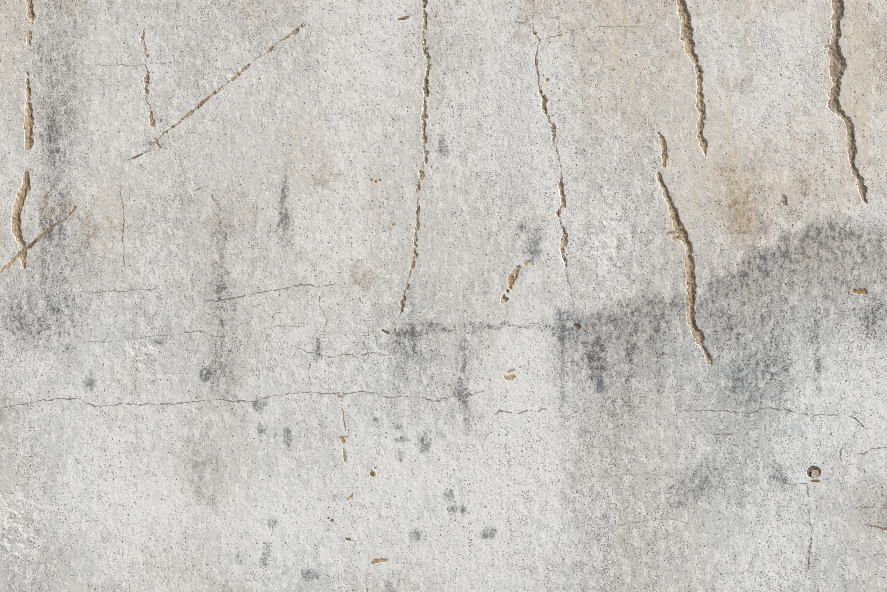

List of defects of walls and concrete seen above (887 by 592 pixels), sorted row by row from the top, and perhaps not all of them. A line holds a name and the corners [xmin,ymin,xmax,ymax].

crack [23,72,34,151]
crack [0,172,76,273]
crack [97,21,306,161]
crack [4,282,485,428]
crack [400,0,431,315]
crack [501,260,531,303]
crack [515,16,575,305]
damp [546,294,686,446]
crack [657,132,712,365]
crack [677,0,707,156]
damp [695,203,887,402]
crack [824,0,867,204]